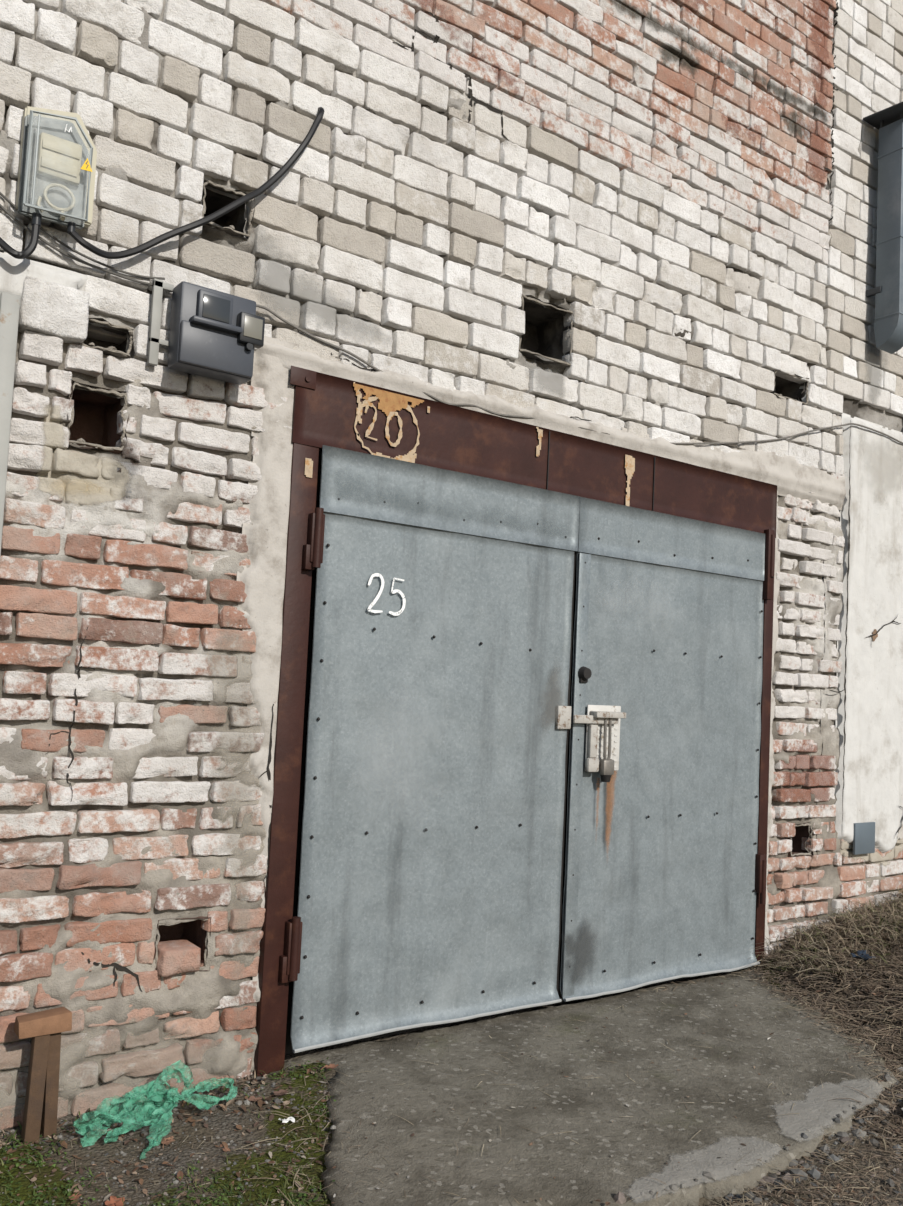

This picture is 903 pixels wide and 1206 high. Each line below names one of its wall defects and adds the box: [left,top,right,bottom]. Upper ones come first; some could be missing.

peeling [353,382,430,463]
peeling [625,454,635,506]
crack [46,627,95,802]
corrosion [596,771,616,845]
spalling [787,822,814,857]
peeling [772,743,835,806]